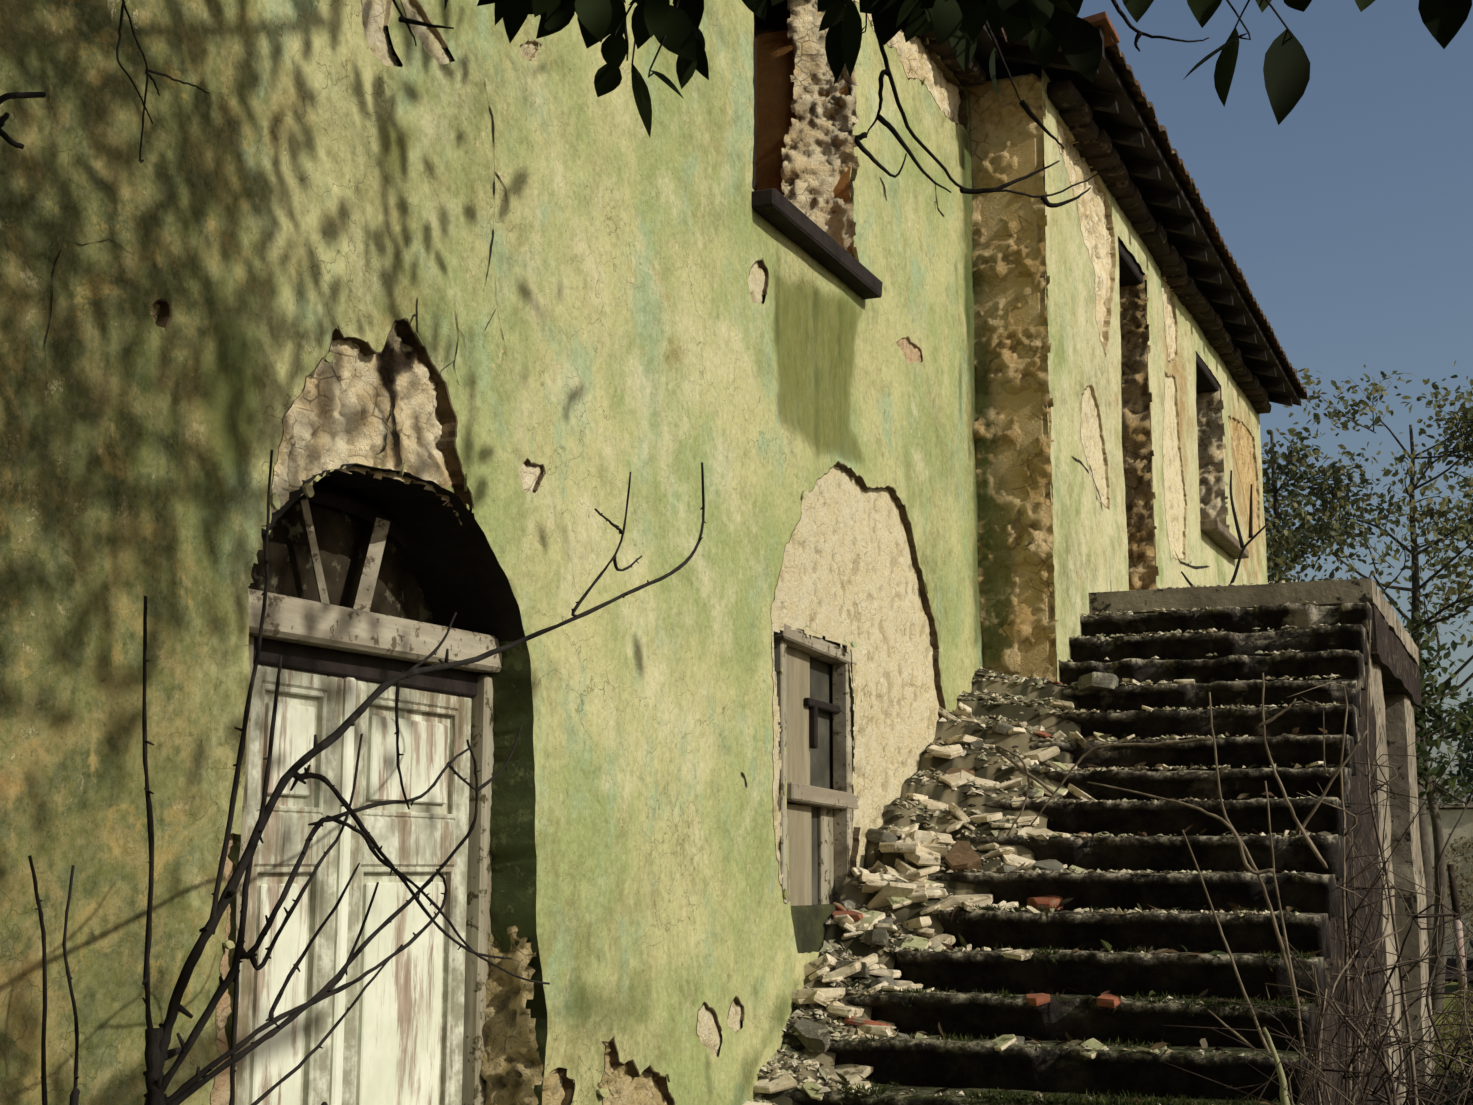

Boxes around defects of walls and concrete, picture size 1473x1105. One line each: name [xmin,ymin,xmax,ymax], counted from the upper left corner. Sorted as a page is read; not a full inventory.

peeling [362,0,453,66]
peeling [520,39,543,61]
spalling [781,0,860,261]
peeling [748,258,769,304]
spalling [845,0,1261,682]
peeling [262,318,475,526]
spalling [519,458,546,493]
peeling [771,461,946,904]
spalling [480,925,579,1105]
peeling [697,996,745,1057]
peeling [597,1036,675,1105]